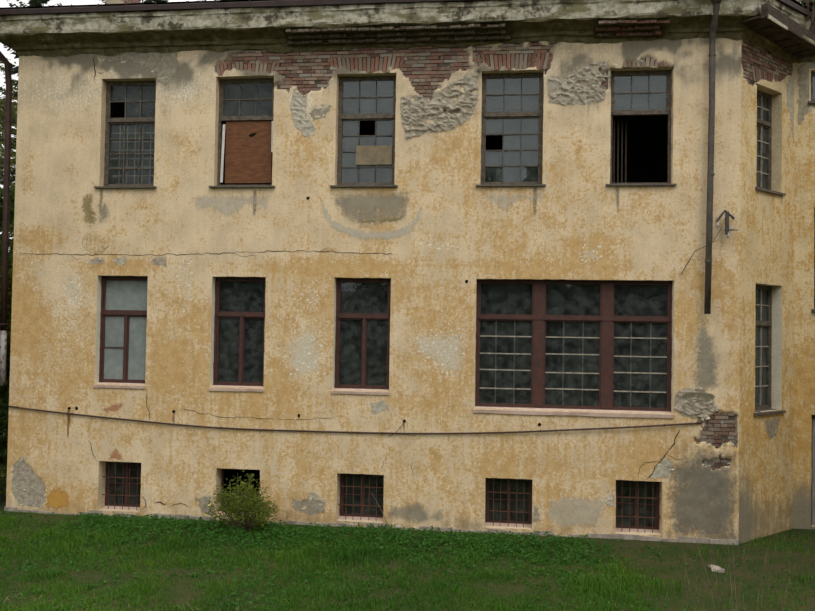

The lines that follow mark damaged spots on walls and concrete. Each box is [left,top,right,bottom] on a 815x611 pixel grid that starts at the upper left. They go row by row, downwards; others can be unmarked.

flaking render [215,41,612,140]
flaking render [741,41,815,137]
crack [26,248,391,260]
peeling [409,328,468,377]
crack [638,429,682,479]
flaking render [678,385,738,470]
spalling [9,456,69,509]
spalling [292,493,327,516]